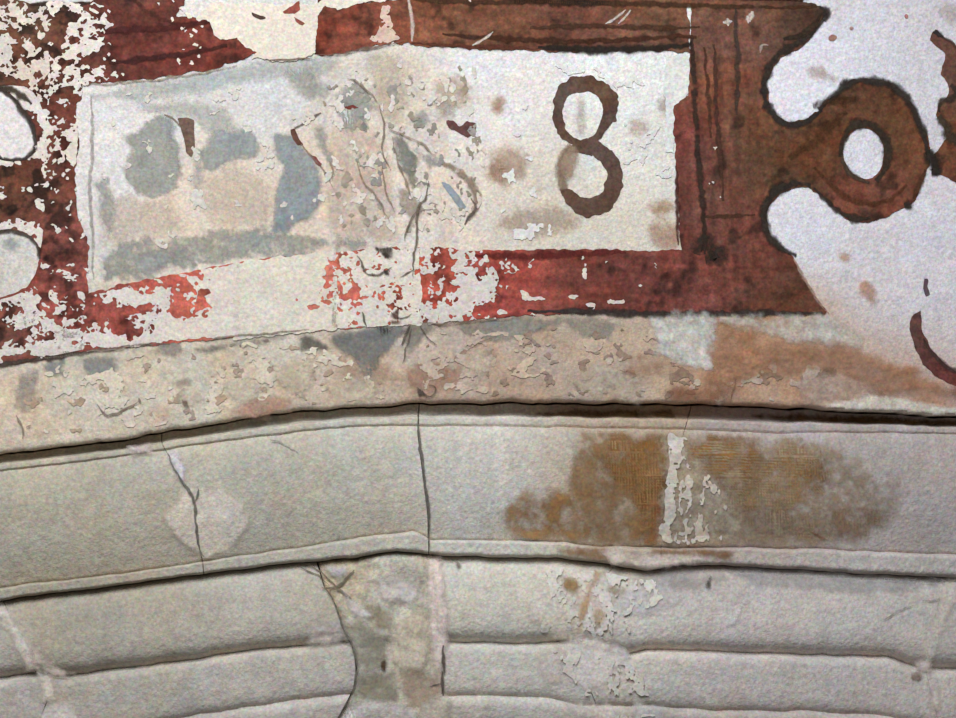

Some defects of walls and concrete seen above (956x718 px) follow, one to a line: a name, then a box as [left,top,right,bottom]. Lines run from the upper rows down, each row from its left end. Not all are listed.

peeling [662,55,690,153]
peeling [0,0,644,427]
peeling [643,314,861,399]
crack [168,454,204,557]
crack [417,385,436,551]
peeling [546,433,748,638]
crack [302,563,359,718]